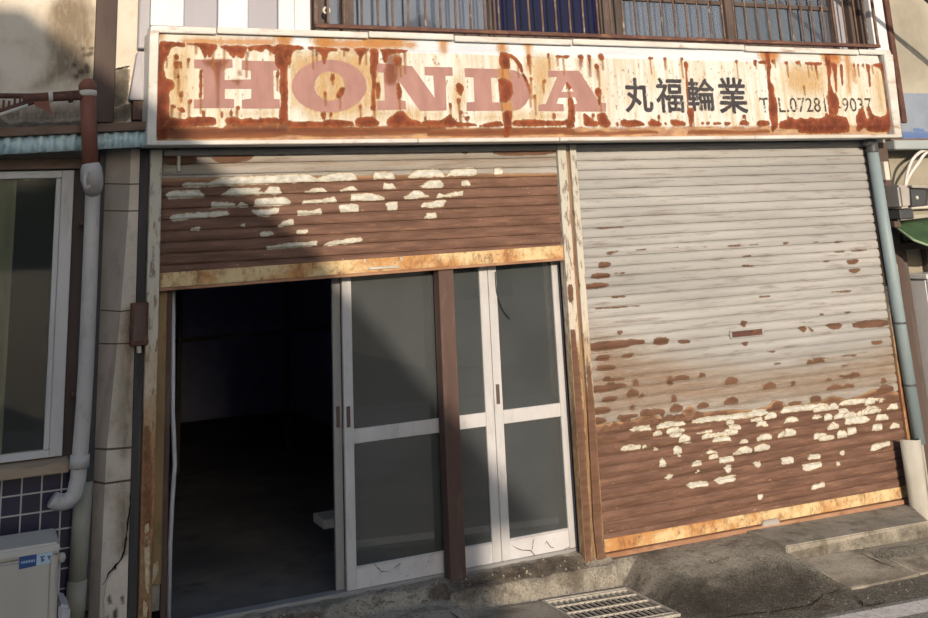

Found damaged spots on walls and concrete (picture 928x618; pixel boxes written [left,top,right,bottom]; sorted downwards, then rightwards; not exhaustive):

rust [156,33,891,140]
rust [162,153,197,165]
rust [212,155,253,163]
rust [160,160,562,273]
rust [834,241,866,273]
rust [853,320,889,328]
rust [570,329,906,563]
crack [103,487,131,584]